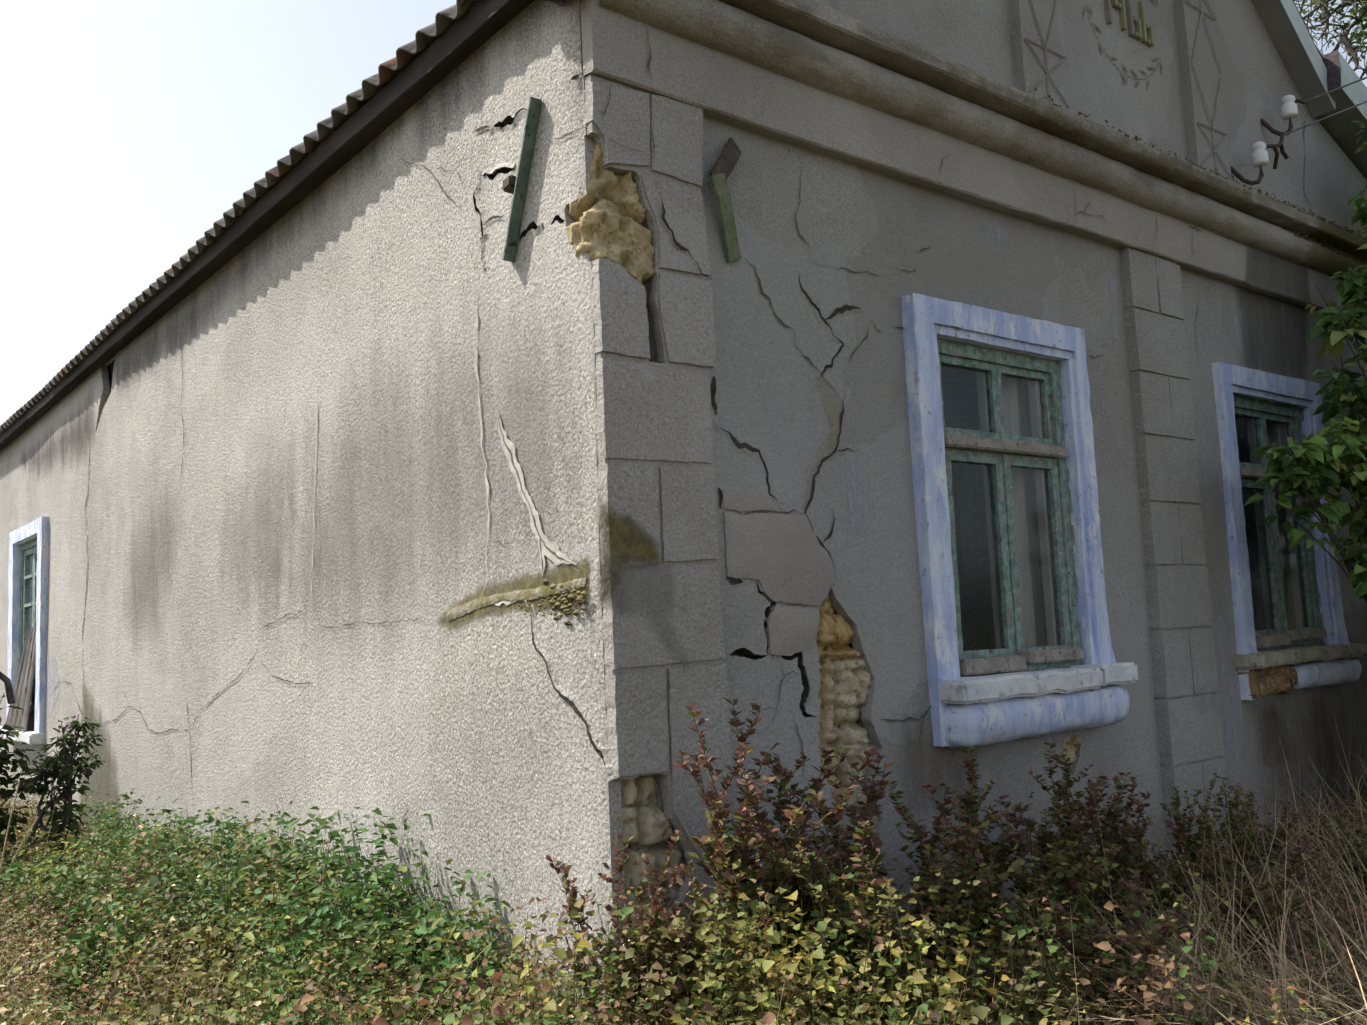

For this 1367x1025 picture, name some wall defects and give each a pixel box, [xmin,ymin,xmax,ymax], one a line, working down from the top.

crack [402,35,710,781]
spalling [566,143,655,300]
crack [711,155,930,576]
crack [51,391,424,790]
spalling [614,774,683,936]
crack [727,576,818,779]
spalling [808,595,880,888]
crack [880,706,931,750]